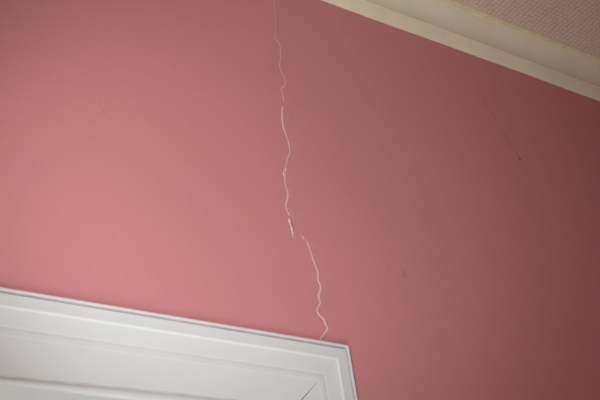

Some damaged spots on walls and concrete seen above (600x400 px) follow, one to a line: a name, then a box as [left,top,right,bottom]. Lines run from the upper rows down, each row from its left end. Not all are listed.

crack [274,0,329,340]